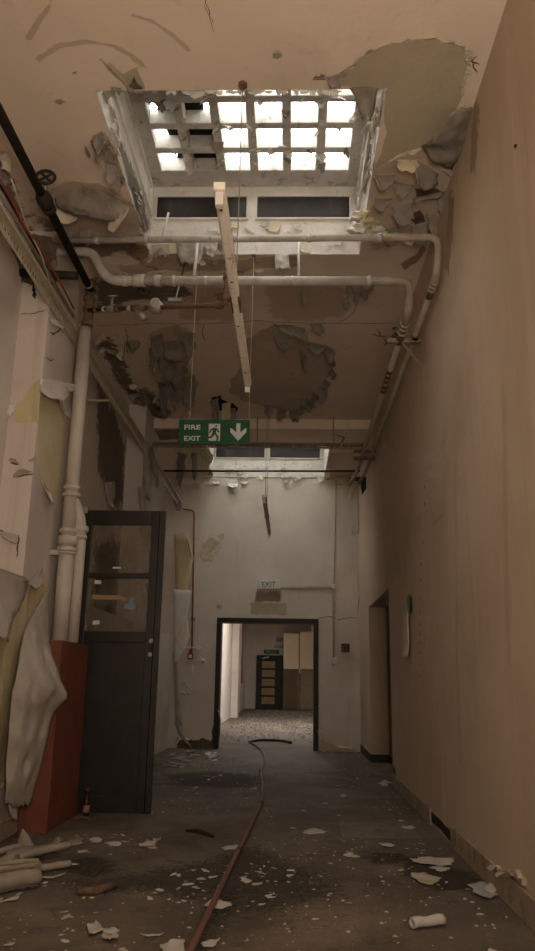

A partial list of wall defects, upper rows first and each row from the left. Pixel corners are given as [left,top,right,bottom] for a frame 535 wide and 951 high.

peeling [50,37,473,247]
spalling [5,221,58,285]
peeling [116,229,275,275]
peeling [289,248,310,268]
peeling [124,325,199,418]
peeling [210,323,337,422]
flaking render [14,379,66,498]
flaking render [0,572,50,789]